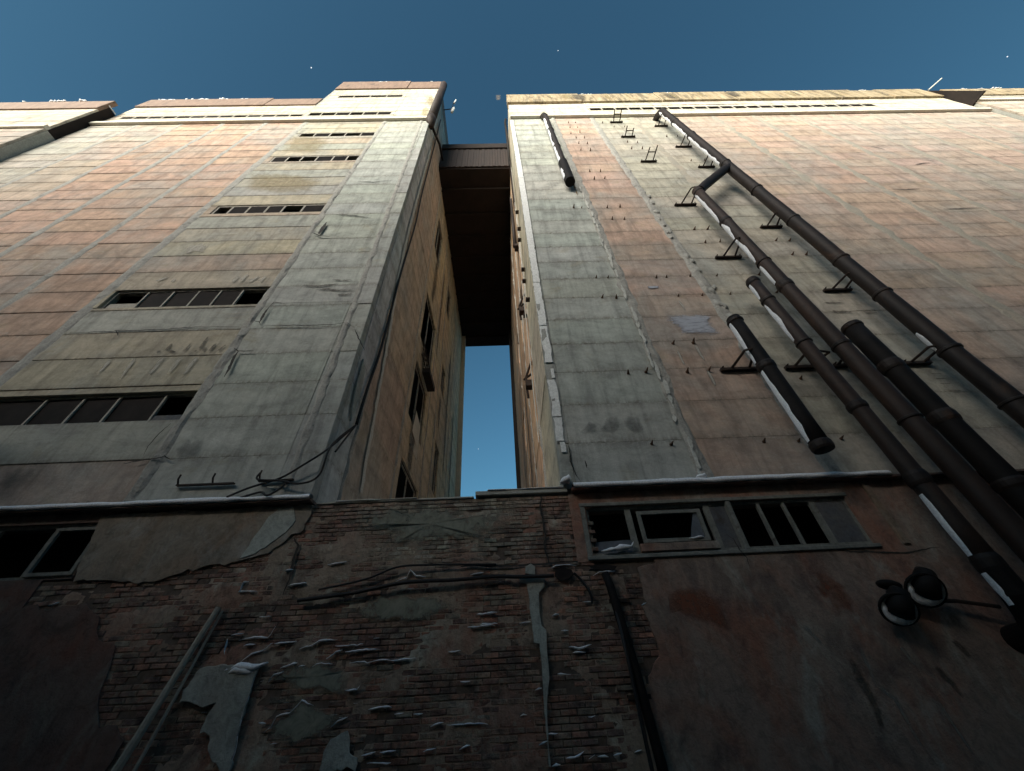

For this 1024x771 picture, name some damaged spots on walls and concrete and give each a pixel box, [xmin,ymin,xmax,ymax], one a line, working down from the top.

peeling [73,504,313,584]
peeling [362,595,444,620]
peeling [519,564,574,767]
peeling [179,664,259,771]
peeling [275,703,358,771]